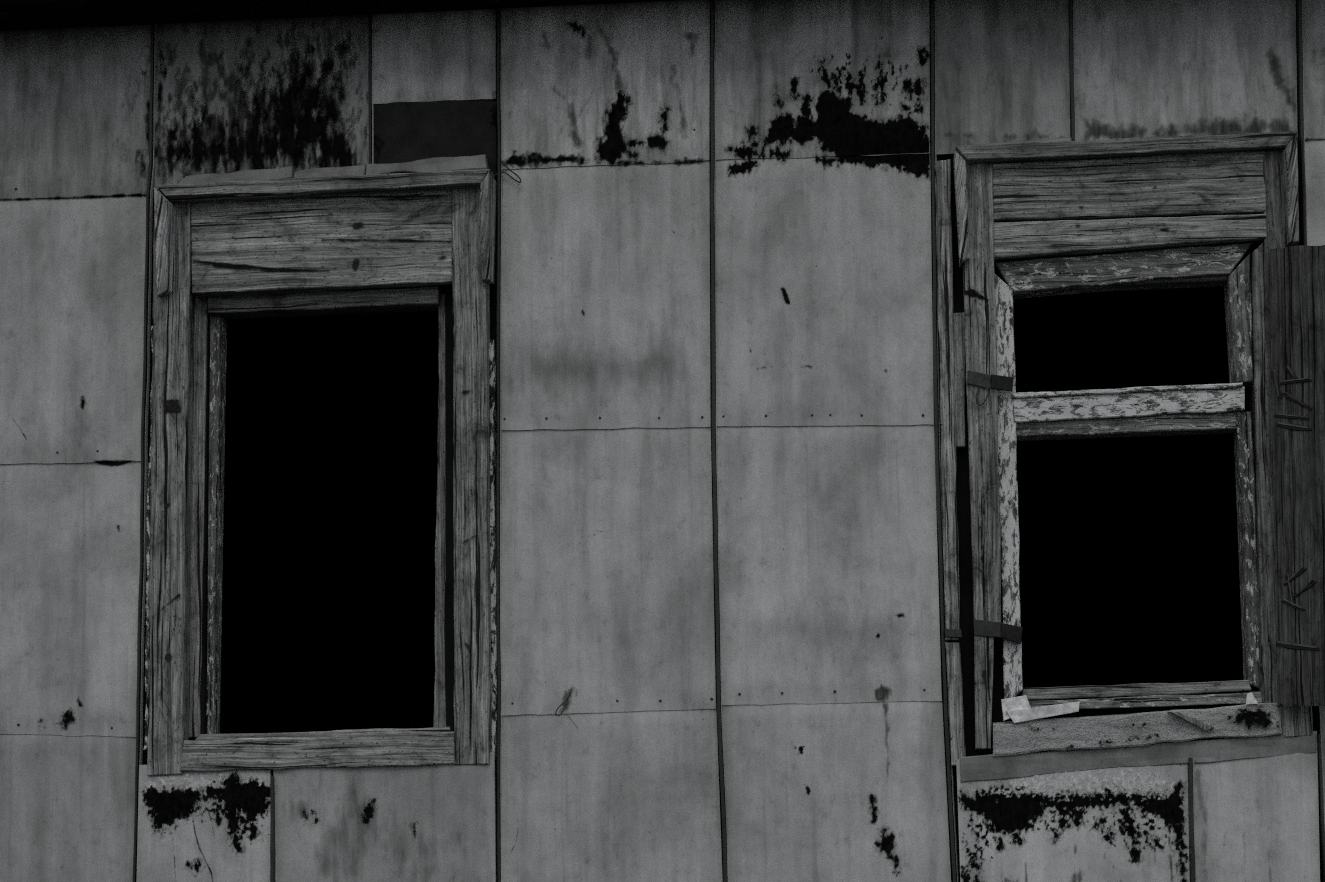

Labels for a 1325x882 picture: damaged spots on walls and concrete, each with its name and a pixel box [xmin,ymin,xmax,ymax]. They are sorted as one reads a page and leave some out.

damp [145,774,222,796]
damp [991,769,1174,801]